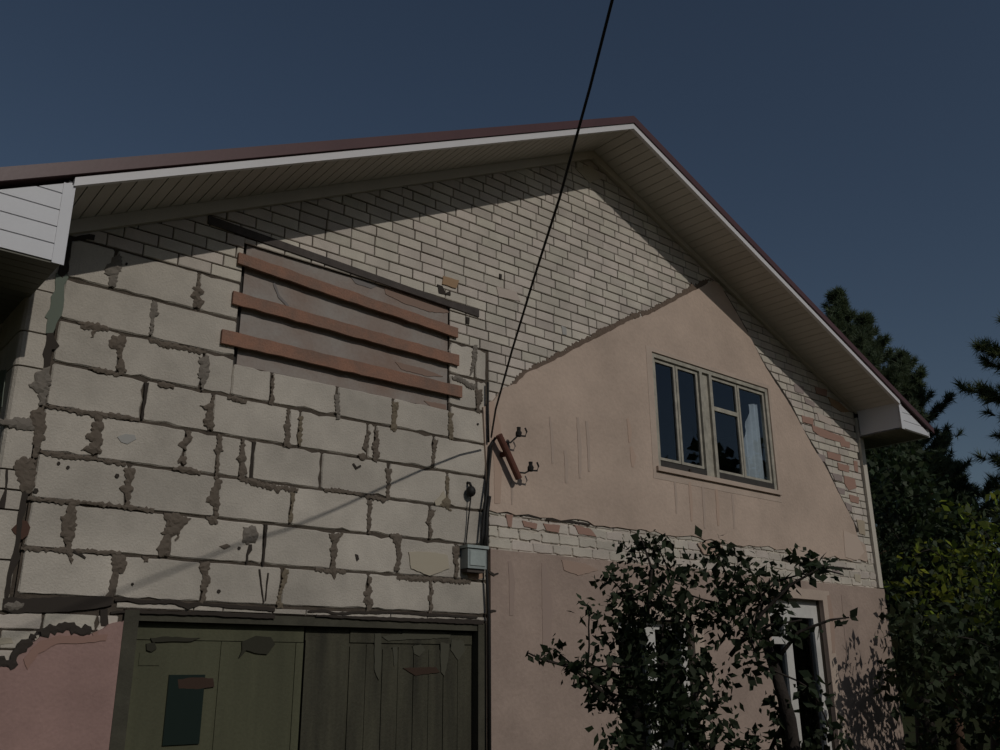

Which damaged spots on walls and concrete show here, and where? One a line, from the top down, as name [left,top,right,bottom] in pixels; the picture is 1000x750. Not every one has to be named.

peeling [801,387,859,512]
peeling [790,548,825,561]
spalling [0,622,95,670]